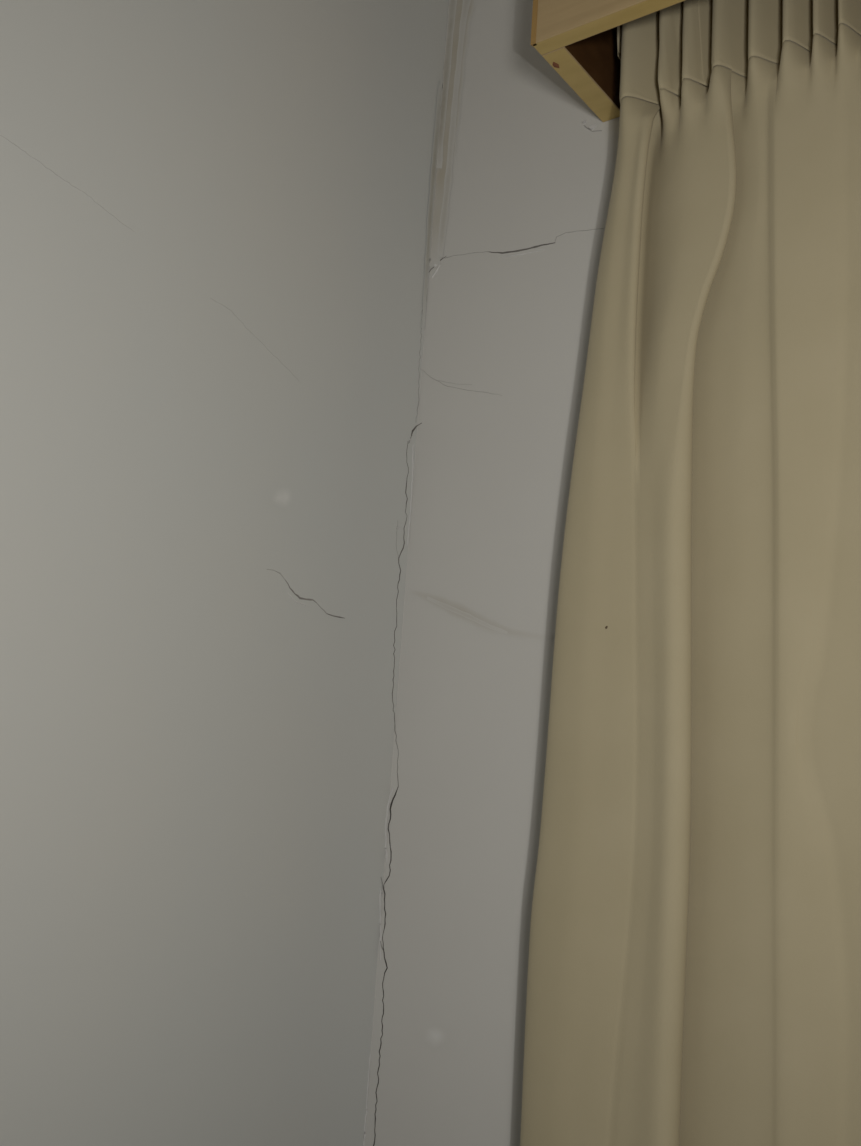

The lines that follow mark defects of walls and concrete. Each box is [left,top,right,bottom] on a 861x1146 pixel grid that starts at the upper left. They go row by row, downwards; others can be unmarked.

crack [429,228,604,278]
crack [267,569,344,618]
crack [363,310,499,1146]